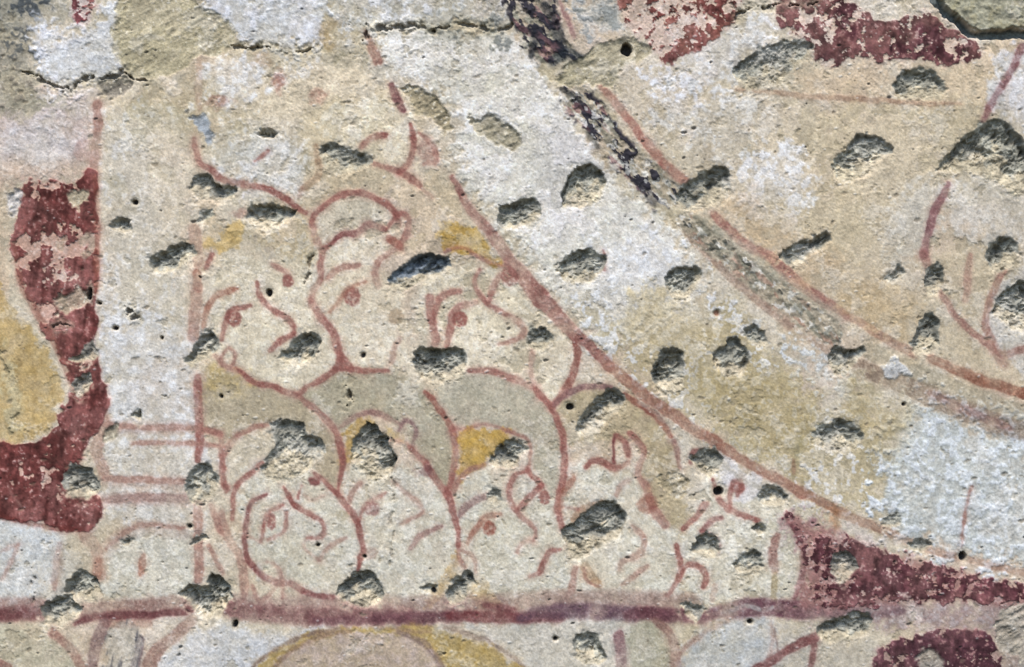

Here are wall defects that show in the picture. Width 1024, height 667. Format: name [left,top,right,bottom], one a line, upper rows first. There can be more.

crack [21,69,151,95]
peeling [502,0,846,349]
spalling [832,153,893,187]
spalling [415,362,467,386]
spalling [713,360,748,379]
spalling [262,450,325,484]
spalling [351,449,394,483]
spalling [562,524,625,563]
spalling [179,594,232,621]
spalling [337,589,384,609]